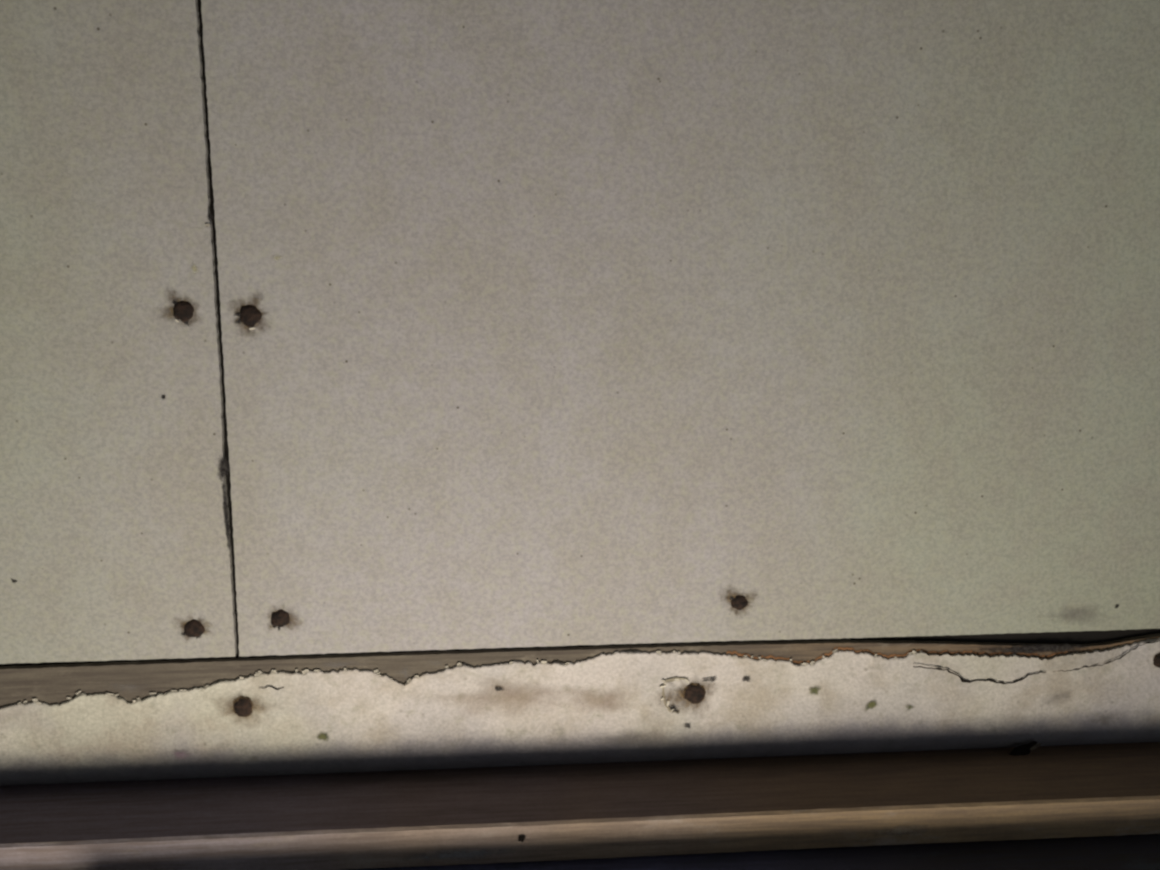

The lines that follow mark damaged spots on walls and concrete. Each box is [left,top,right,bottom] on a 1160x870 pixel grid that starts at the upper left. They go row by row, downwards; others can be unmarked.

peeling [0,636,1160,707]
crack [913,640,1160,684]
spalling [659,677,689,713]